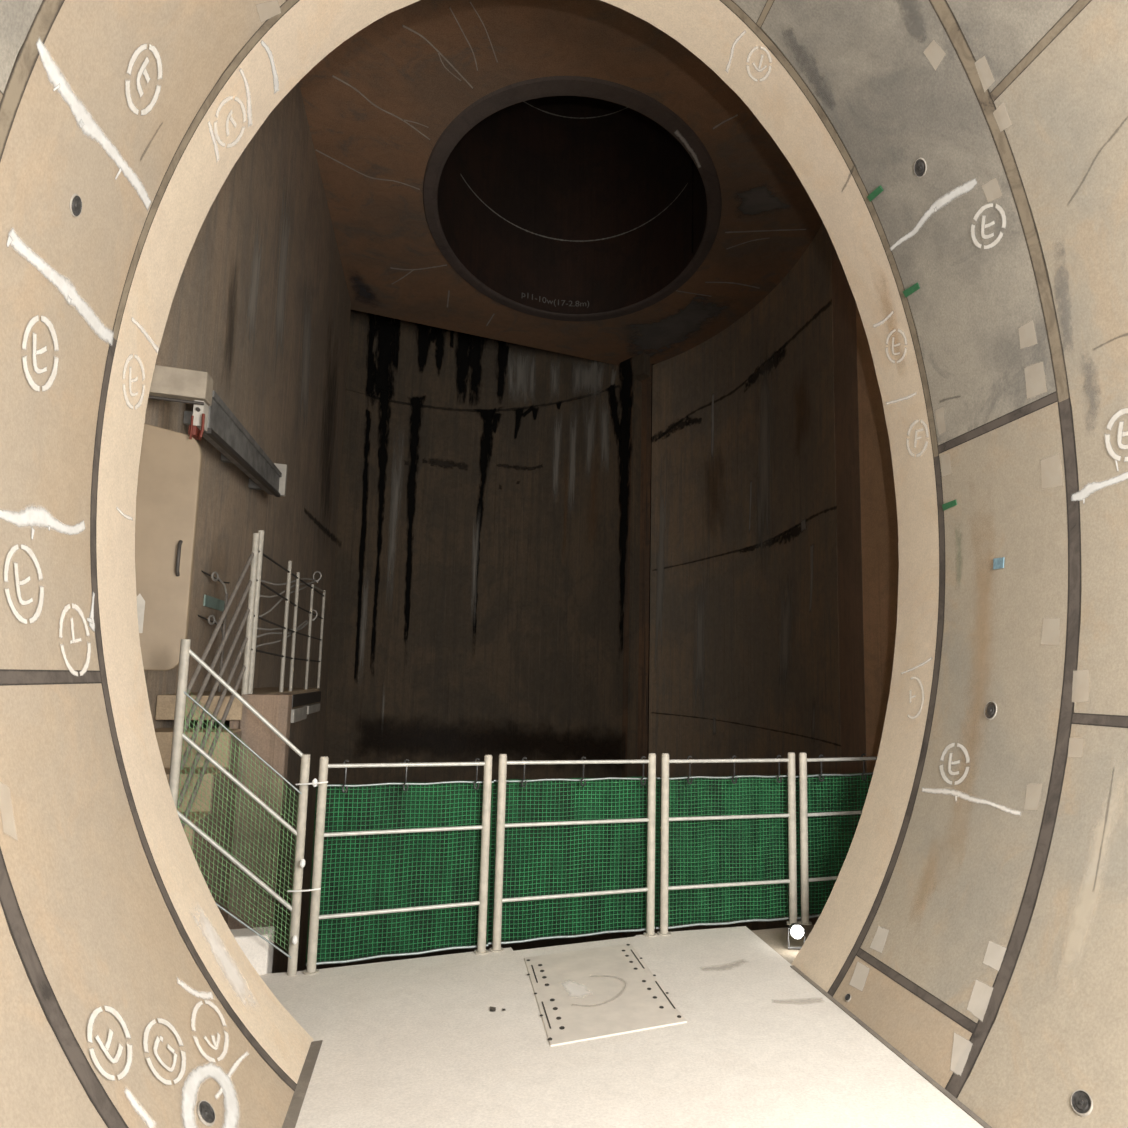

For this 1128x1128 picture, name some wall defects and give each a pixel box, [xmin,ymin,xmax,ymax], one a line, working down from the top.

damp [352,277,425,682]
damp [416,323,538,634]